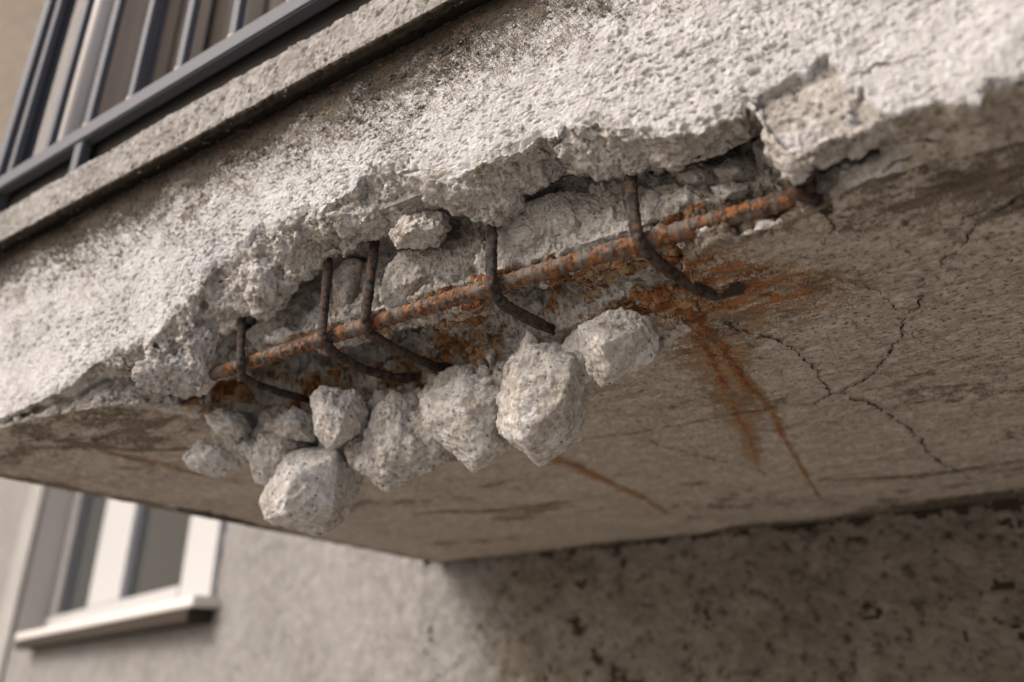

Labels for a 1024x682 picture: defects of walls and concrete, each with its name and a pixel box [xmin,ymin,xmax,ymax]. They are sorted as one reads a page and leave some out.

spalling [0,63,906,428]
rust [179,235,879,501]
rust [548,454,670,515]
rust [643,201,708,230]
crack [595,196,1024,484]